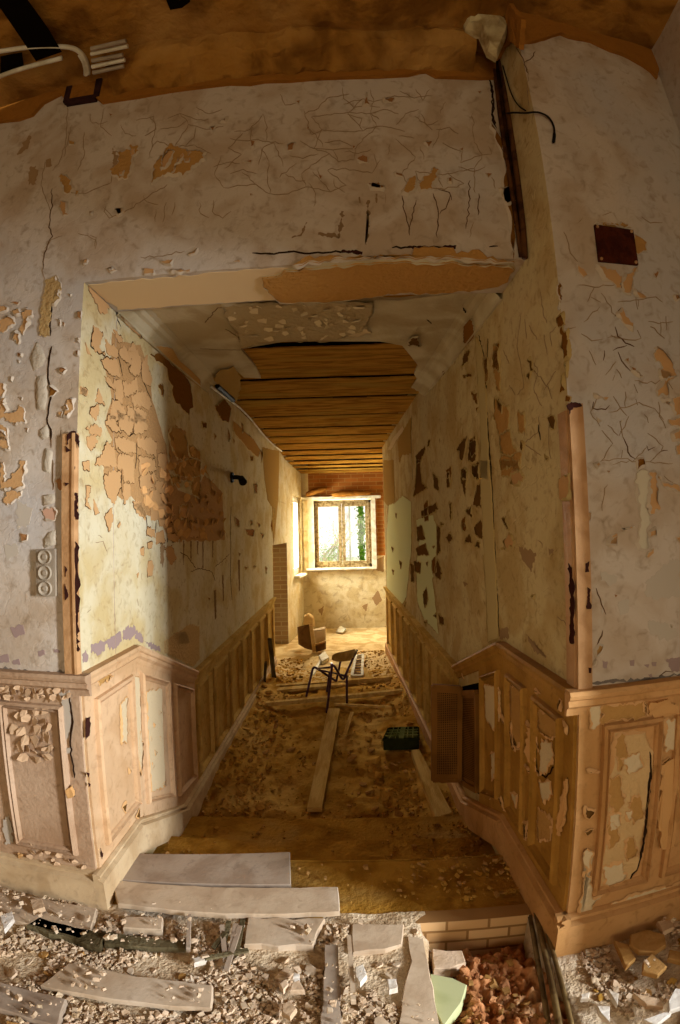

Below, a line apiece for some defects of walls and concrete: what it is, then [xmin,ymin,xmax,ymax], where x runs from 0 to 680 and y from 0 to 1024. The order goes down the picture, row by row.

crack [41,80,500,279]
peeling [0,376,29,506]
peeling [0,301,34,364]
peeling [48,286,279,578]
peeling [461,317,526,487]
spalling [556,281,572,402]
crack [478,212,680,558]
spalling [383,418,484,627]
peeling [0,685,71,764]
crack [68,698,76,797]
peeling [583,730,680,887]
crack [630,752,652,879]